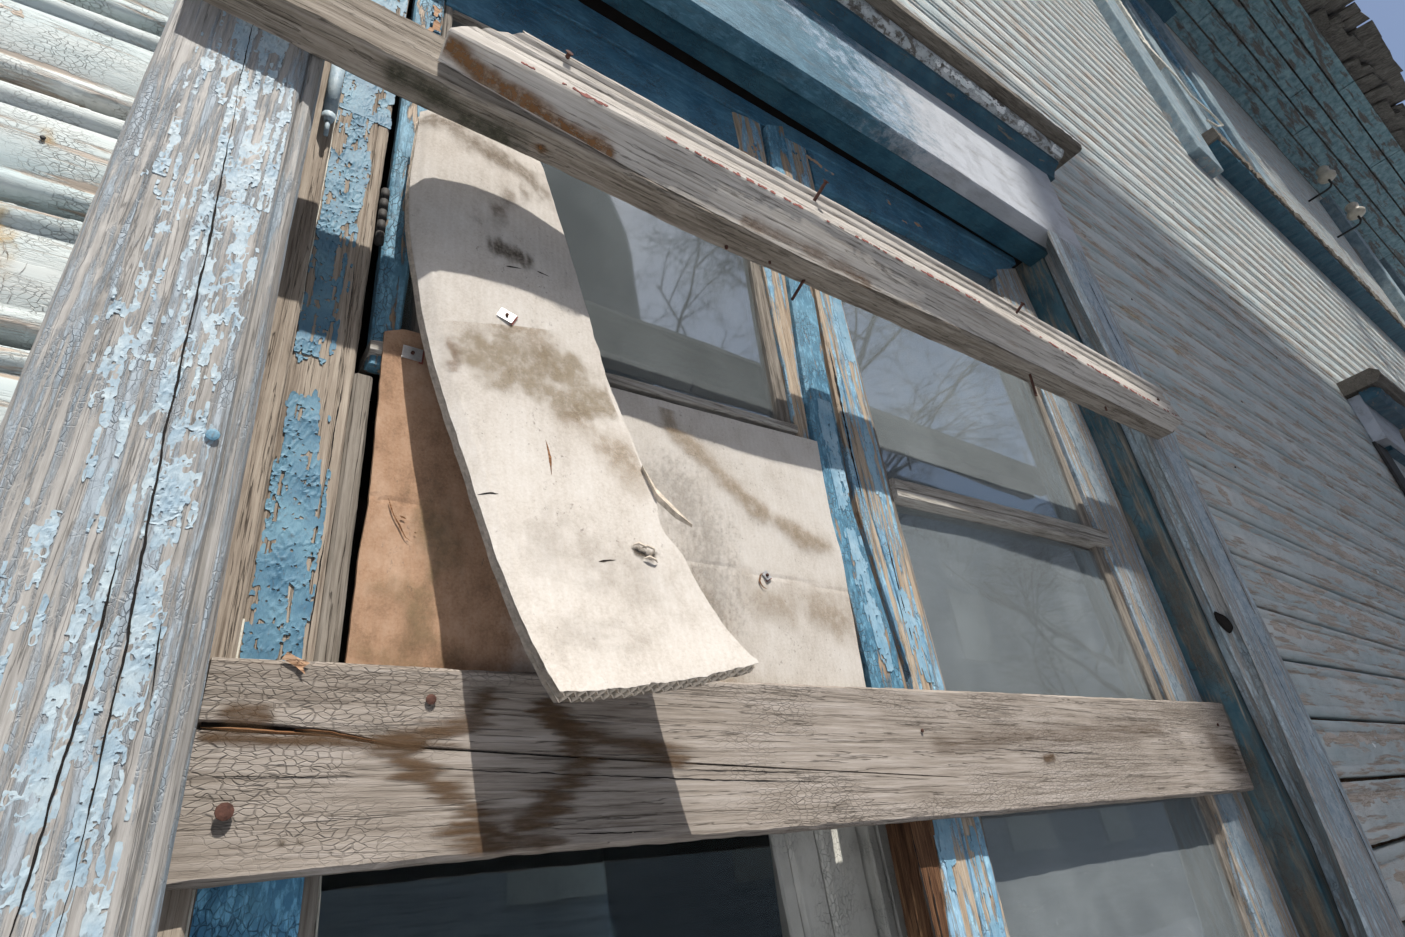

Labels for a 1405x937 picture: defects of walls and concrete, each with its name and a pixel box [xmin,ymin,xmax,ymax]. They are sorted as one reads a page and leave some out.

peeling [372,0,408,18]
corrosion [443,37,614,158]
peeling [293,71,395,365]
peeling [832,298,857,364]
crack [9,26,253,937]
peeling [0,11,305,937]
peeling [240,389,331,661]
peeling [817,398,849,511]
peeling [844,527,894,672]
water stain [200,691,689,856]
crack [200,722,848,783]
crack [562,828,655,836]